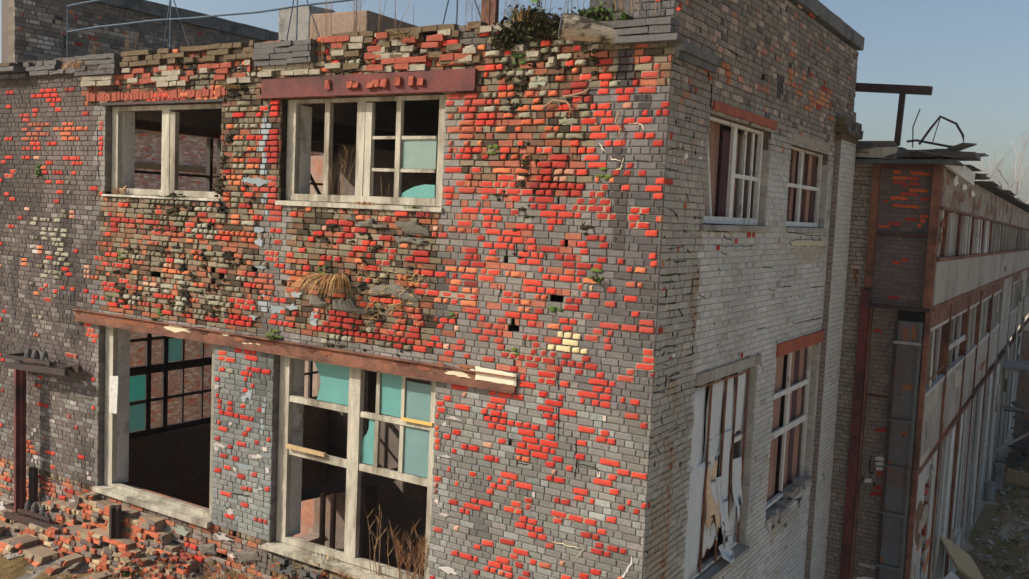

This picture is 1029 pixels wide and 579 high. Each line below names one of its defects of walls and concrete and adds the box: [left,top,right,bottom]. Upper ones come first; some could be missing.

peeling [21,44,702,579]
spalling [435,34,465,66]